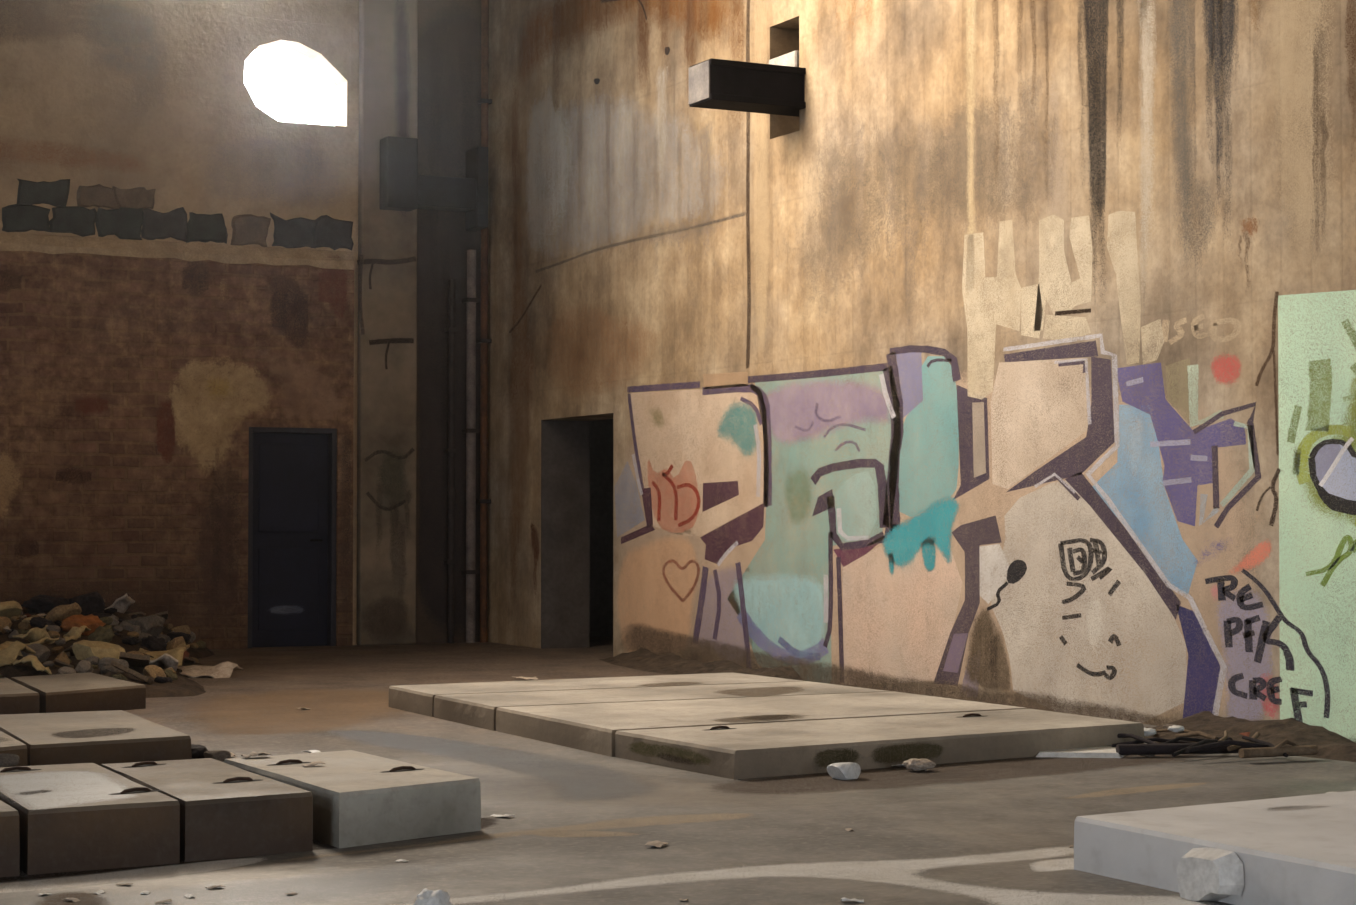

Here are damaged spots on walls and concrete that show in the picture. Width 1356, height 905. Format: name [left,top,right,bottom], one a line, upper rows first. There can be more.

leakage [782,0,1341,334]